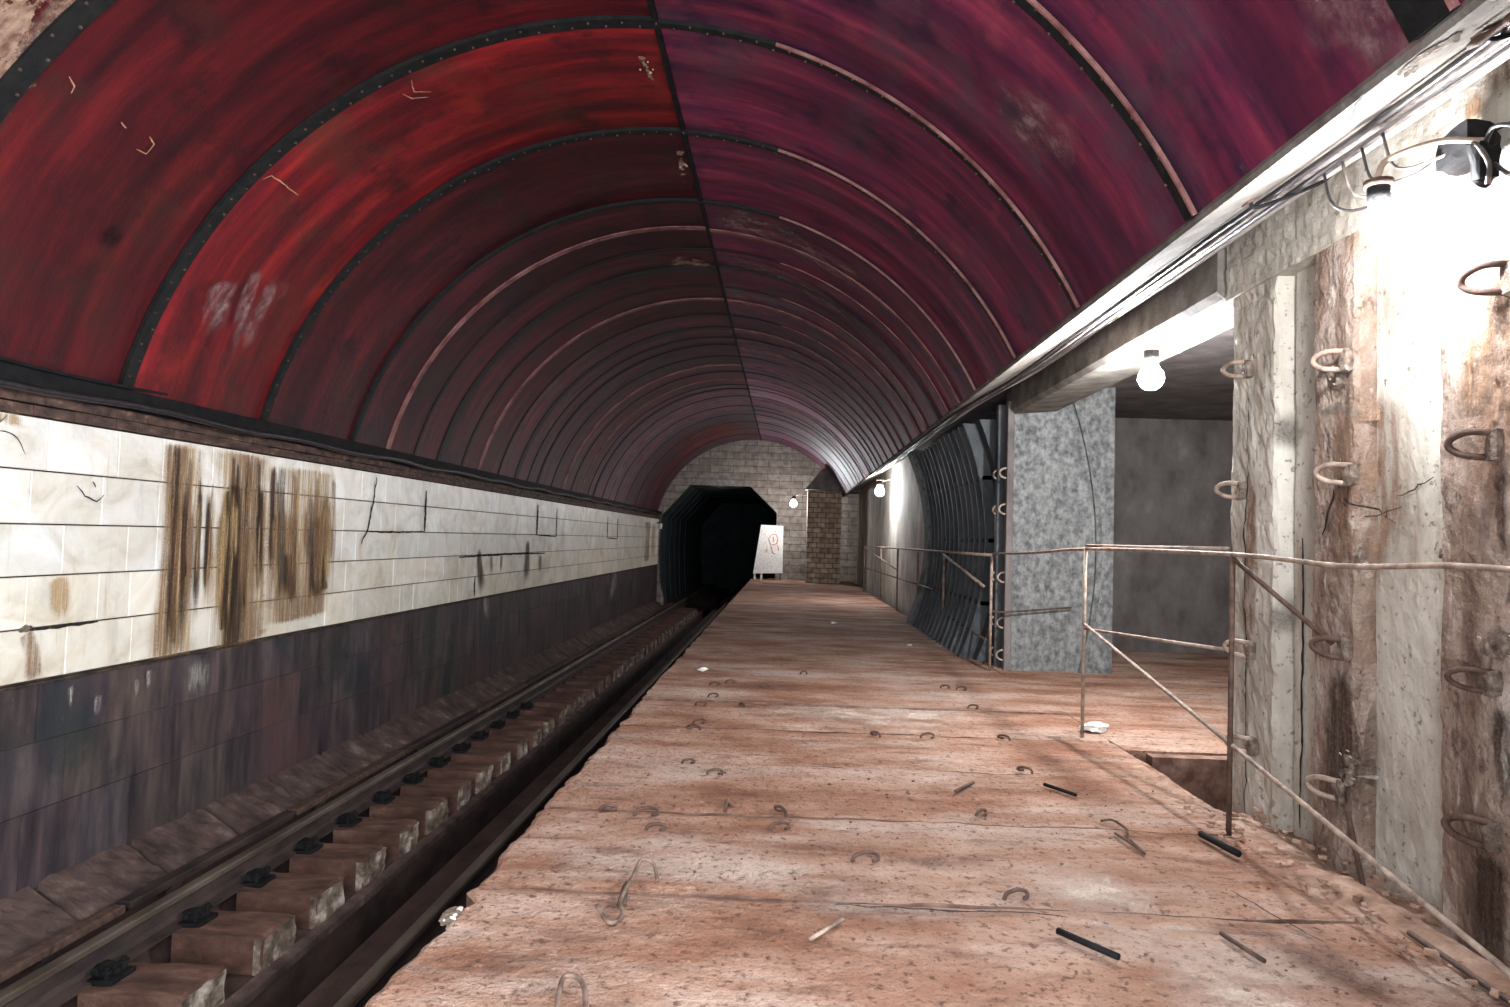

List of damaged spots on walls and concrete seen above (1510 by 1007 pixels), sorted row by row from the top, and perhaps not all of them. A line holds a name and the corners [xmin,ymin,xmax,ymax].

peeling [0,0,75,78]
rust [154,445,212,656]
rust [273,470,336,622]